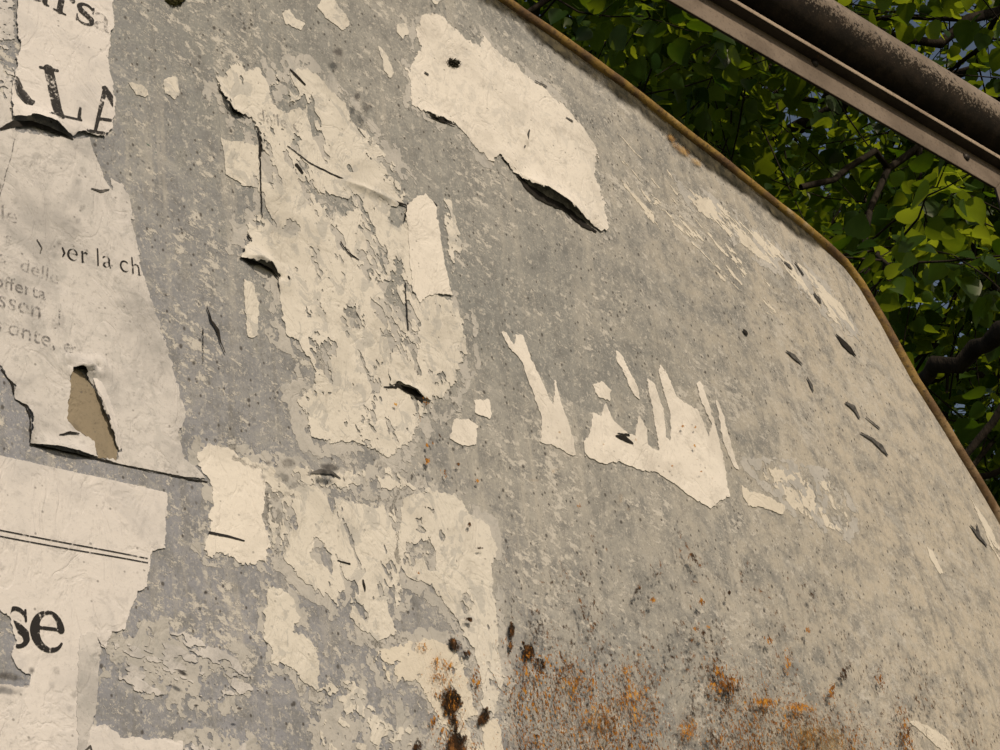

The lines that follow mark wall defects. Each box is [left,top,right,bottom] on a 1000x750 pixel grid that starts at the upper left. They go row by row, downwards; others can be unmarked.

corrosion [676,531,771,599]
corrosion [412,627,491,750]